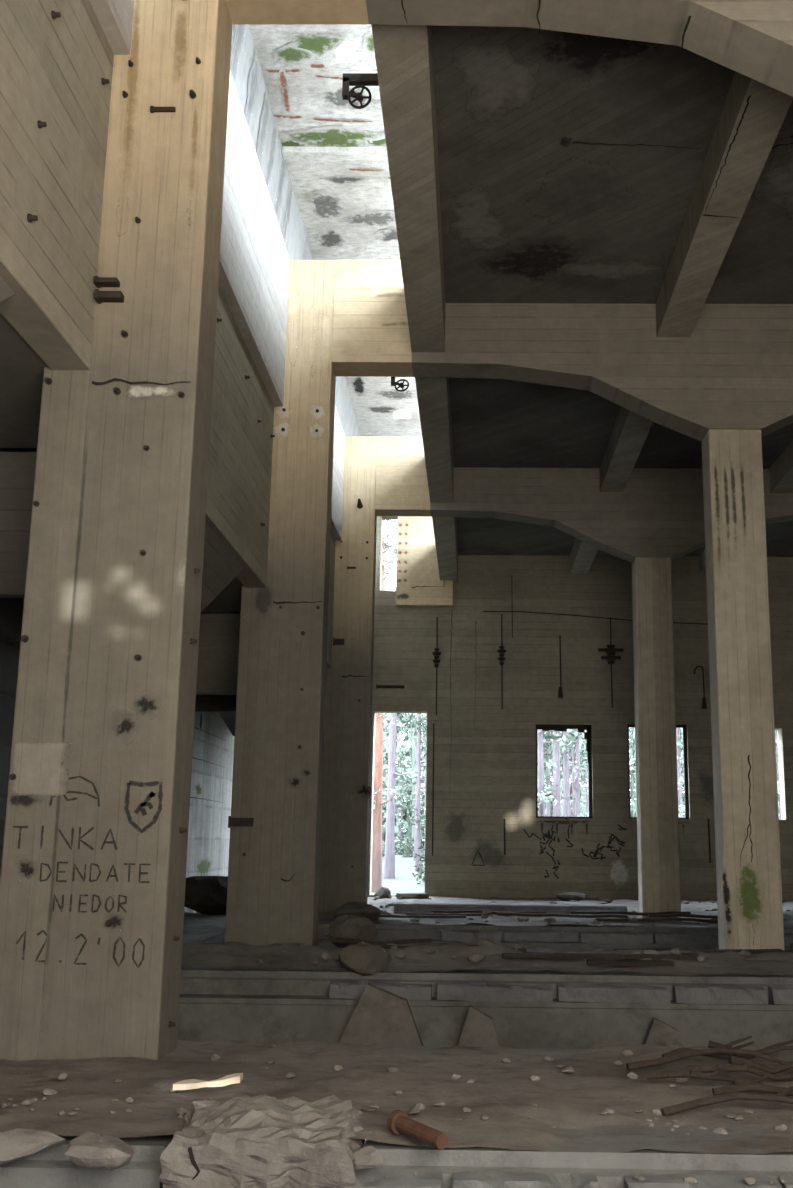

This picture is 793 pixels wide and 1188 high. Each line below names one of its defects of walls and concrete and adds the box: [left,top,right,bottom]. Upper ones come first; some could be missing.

leakage [230,25,293,243]
leakage [315,85,381,112]
leakage [308,176,398,249]
crack [92,377,191,385]